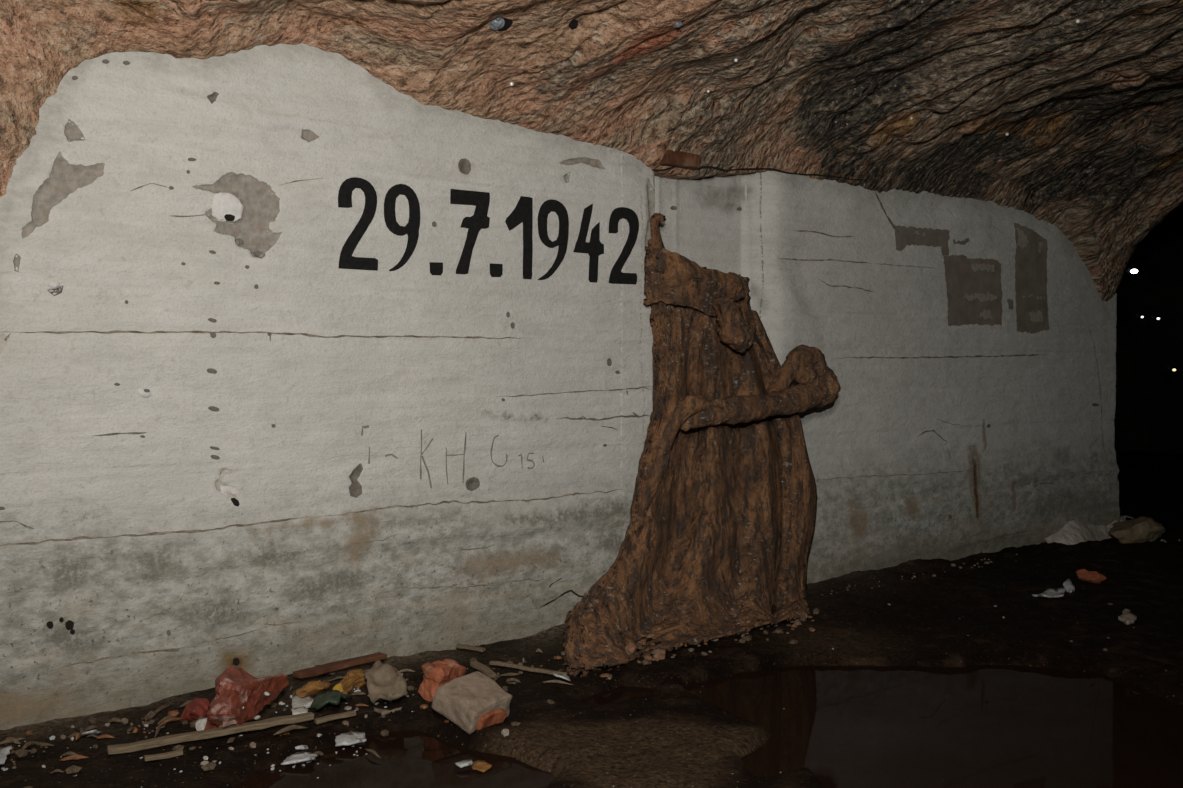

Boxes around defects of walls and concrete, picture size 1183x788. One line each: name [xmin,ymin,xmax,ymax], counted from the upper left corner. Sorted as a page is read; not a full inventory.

flaking render [22,118,105,238]
flaking render [186,158,282,269]